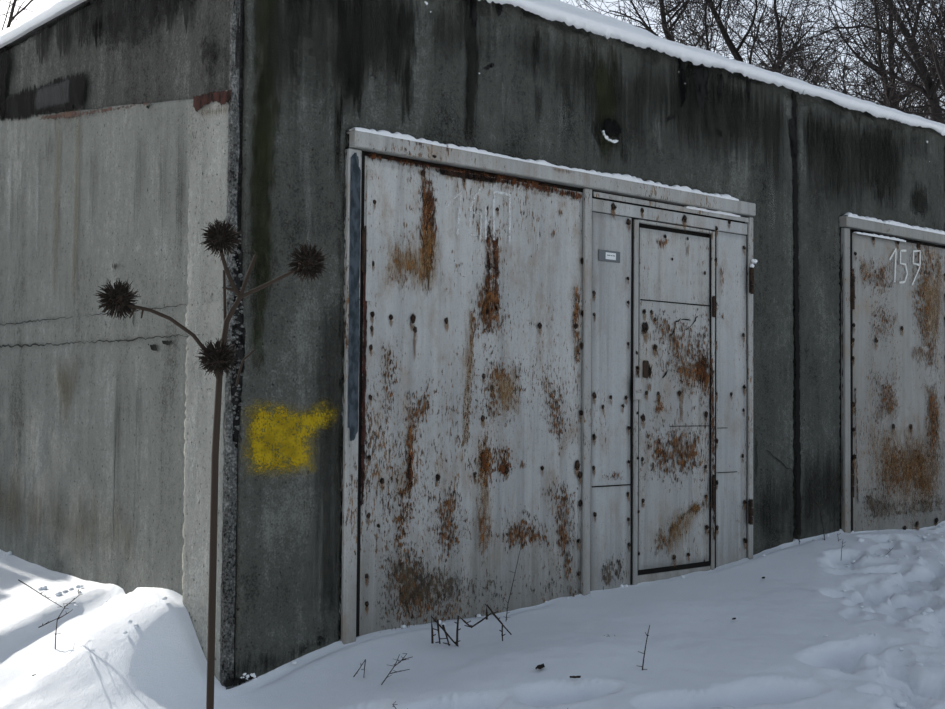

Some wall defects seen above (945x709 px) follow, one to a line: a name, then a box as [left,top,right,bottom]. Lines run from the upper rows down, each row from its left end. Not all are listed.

damp [36,0,190,63]
rust [193,90,232,115]
damp [441,0,479,137]
damp [534,30,780,172]
damp [251,0,416,362]
rust [367,146,582,293]
damp [912,184,928,218]
damp [324,327,343,600]
rust [360,206,724,630]
rust [851,240,945,530]